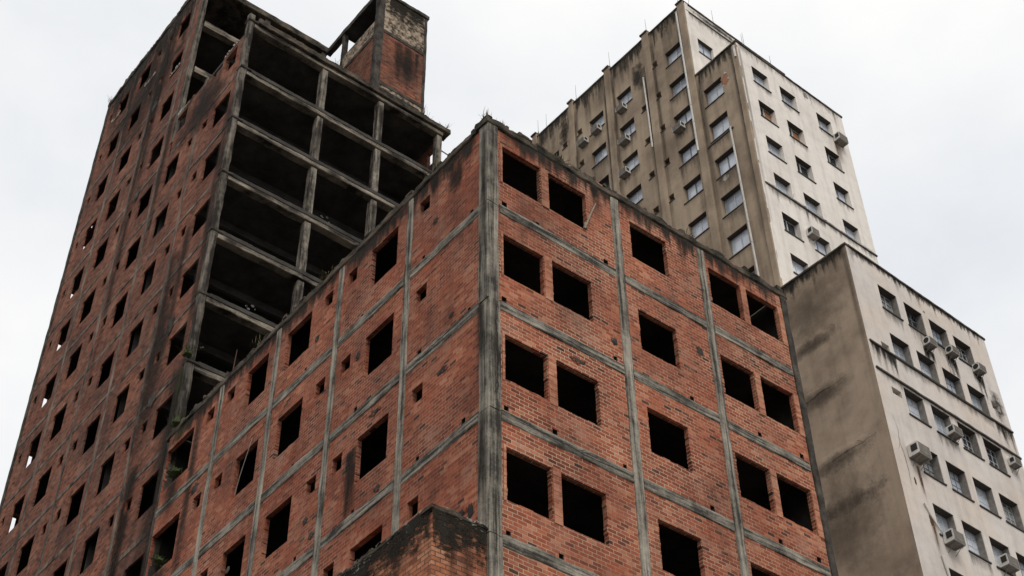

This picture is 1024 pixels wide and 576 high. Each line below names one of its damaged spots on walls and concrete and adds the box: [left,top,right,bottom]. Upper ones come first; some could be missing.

leakage [871,342,906,369]